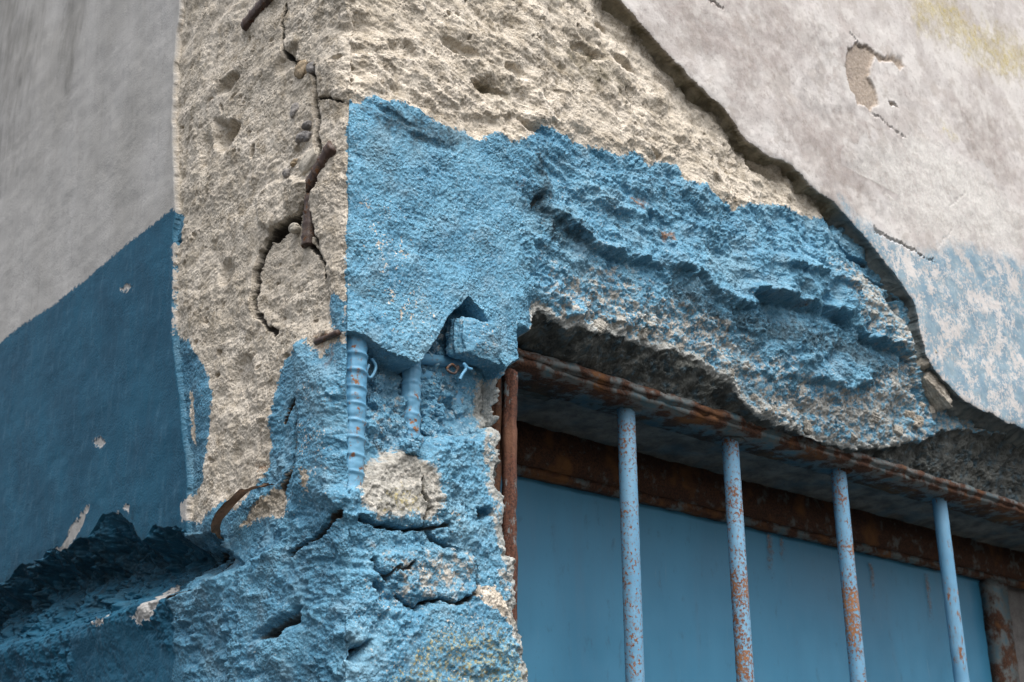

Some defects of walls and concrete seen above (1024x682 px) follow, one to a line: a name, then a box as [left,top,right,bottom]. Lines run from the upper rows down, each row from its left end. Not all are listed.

spalling [0,0,354,648]
crack [248,2,345,335]
crack [286,476,482,610]
spalling [347,330,507,519]
spalling [349,0,1024,449]